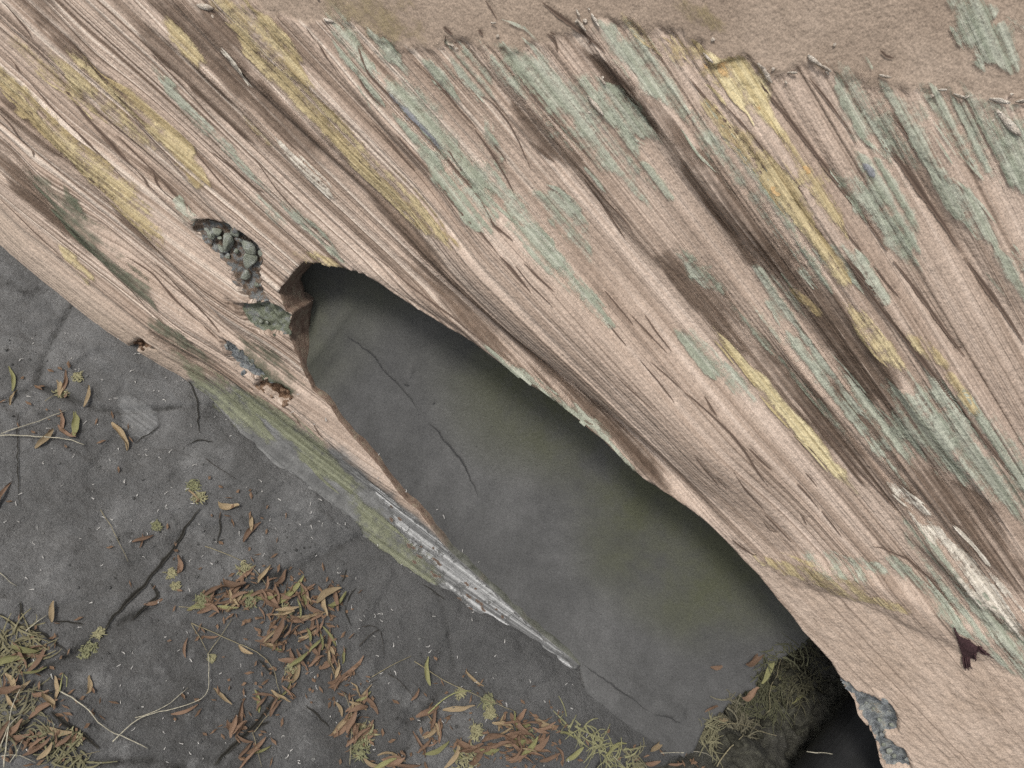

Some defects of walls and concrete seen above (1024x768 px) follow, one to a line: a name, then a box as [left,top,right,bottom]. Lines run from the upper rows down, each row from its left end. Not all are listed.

crack [0,509,225,651]